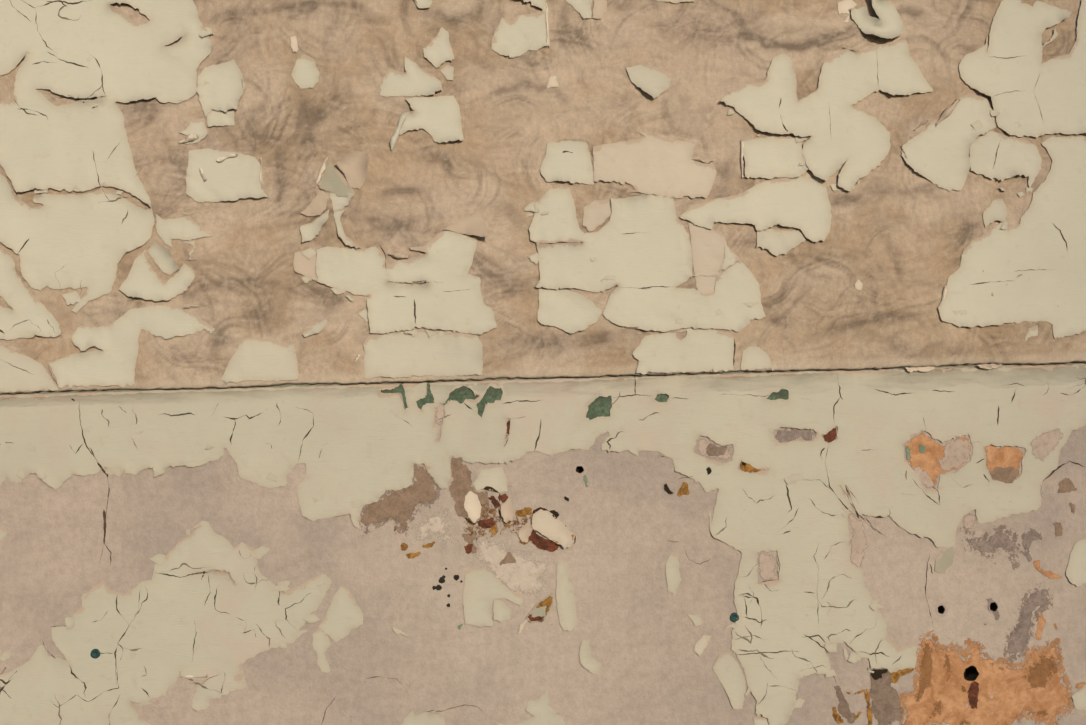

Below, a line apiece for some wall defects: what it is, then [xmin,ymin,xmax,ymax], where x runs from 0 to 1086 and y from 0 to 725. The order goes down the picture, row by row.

crack [0,671,17,699]
crack [10,0,105,119]
peeling [0,304,215,392]
crack [93,142,128,224]
peeling [0,0,246,340]
crack [2,360,321,564]
crack [43,551,310,725]
peeling [293,150,497,379]
peeling [0,346,1086,725]
peeling [524,40,933,374]
crack [735,448,901,704]
peeling [901,0,1086,341]